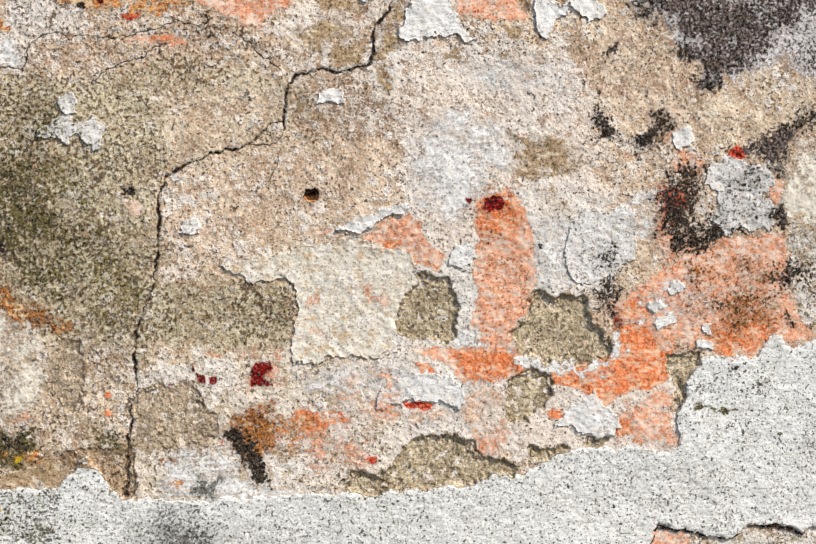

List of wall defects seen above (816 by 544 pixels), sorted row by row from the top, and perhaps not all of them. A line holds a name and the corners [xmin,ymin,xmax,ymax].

peeling [0,20,21,69]
peeling [128,0,293,47]
peeling [284,0,607,107]
mould [625,0,816,94]
flaking render [286,83,346,125]
crack [123,0,394,497]
mould [648,108,816,350]
peeling [0,105,816,505]
peeling [651,524,691,544]
peeling [782,514,812,533]